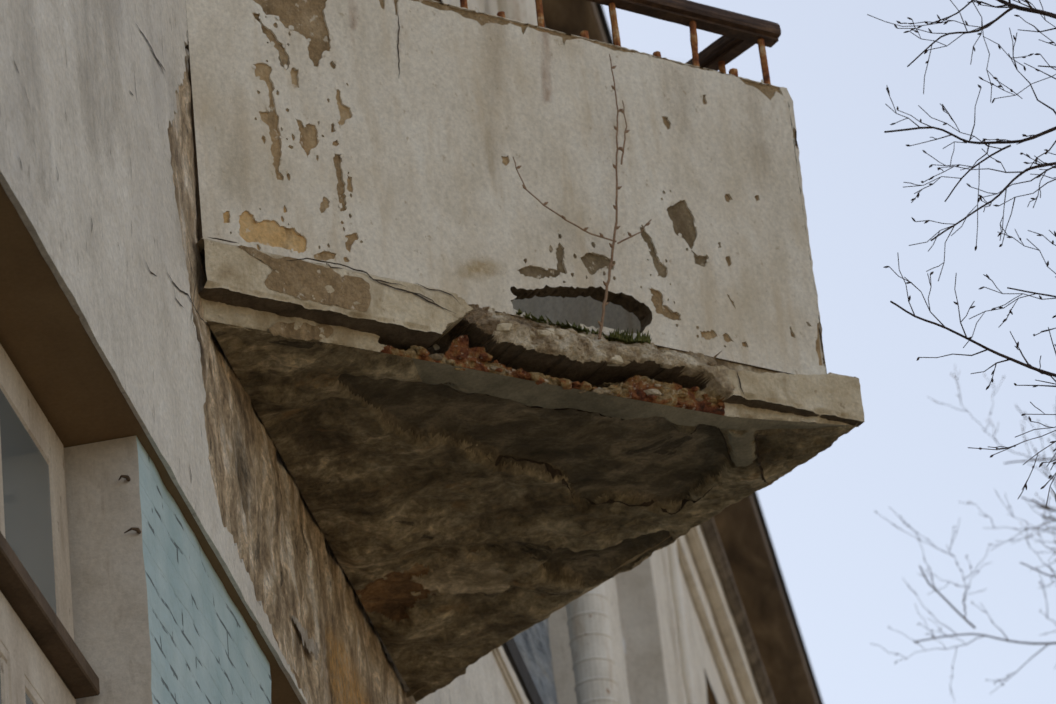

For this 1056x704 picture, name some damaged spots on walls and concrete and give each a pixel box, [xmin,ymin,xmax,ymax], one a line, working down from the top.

spalling [199,0,864,507]
crack [287,258,461,314]
crack [519,402,624,420]
crack [487,455,722,515]
crack [756,433,769,484]